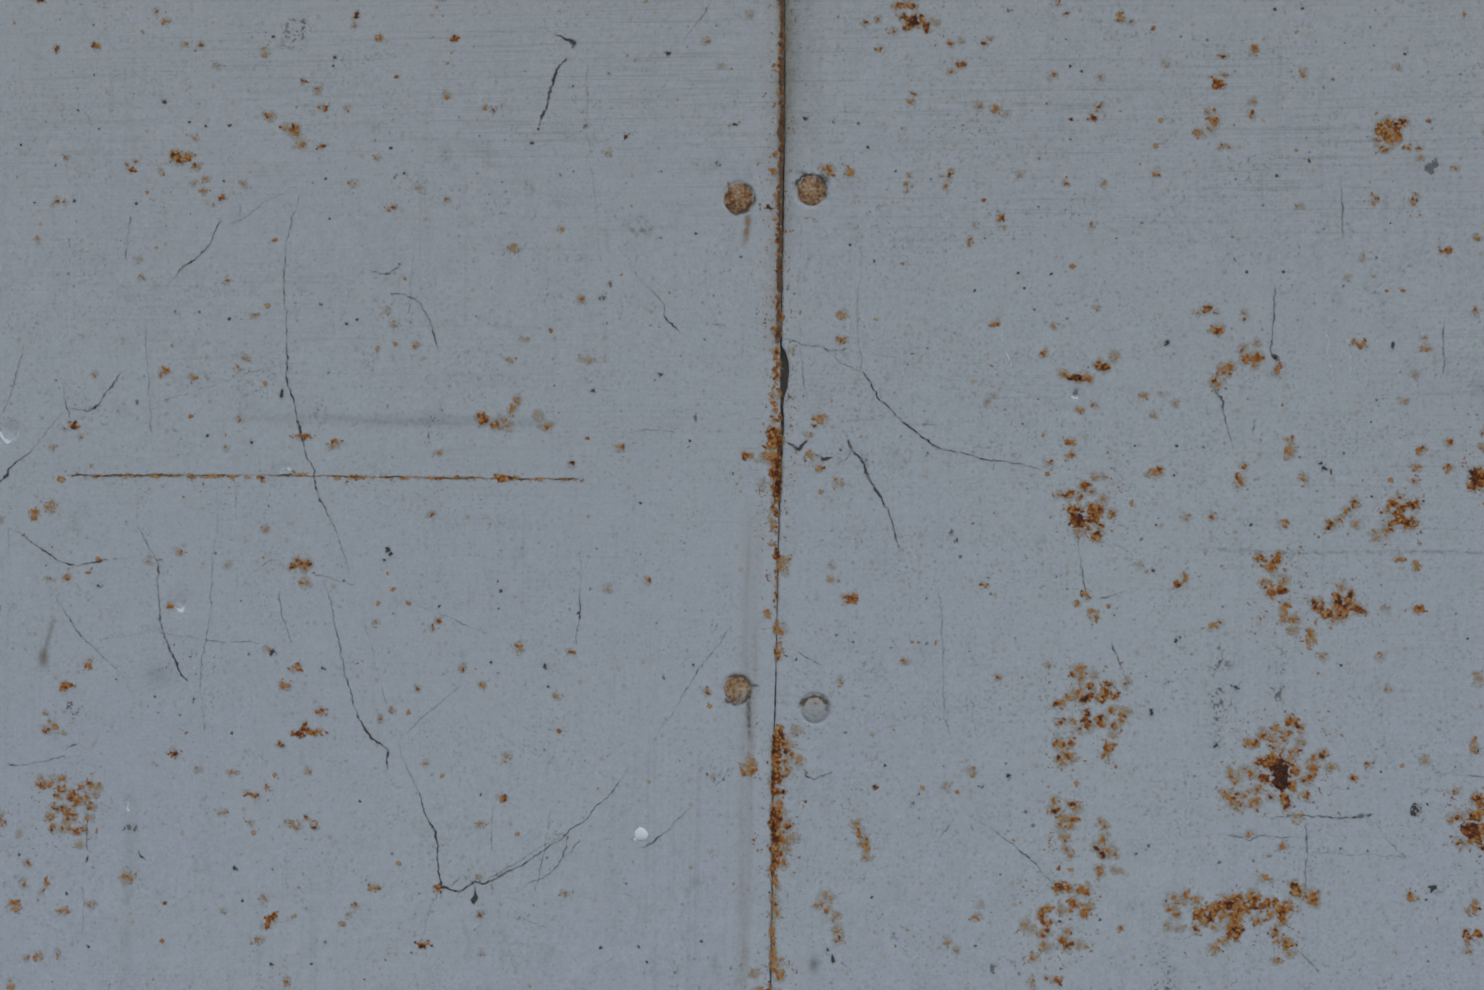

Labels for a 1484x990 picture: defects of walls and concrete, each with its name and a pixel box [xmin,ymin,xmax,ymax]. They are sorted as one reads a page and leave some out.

crack [540,35,576,119]
crack [281,259,328,515]
rust [741,0,844,662]
crack [864,373,1019,464]
crack [788,440,897,541]
rust [1041,433,1133,542]
rust [1247,546,1369,674]
crack [336,633,389,765]
crack [420,790,614,903]
rust [1014,657,1131,987]
rust [1163,841,1320,963]
rust [1215,707,1370,825]